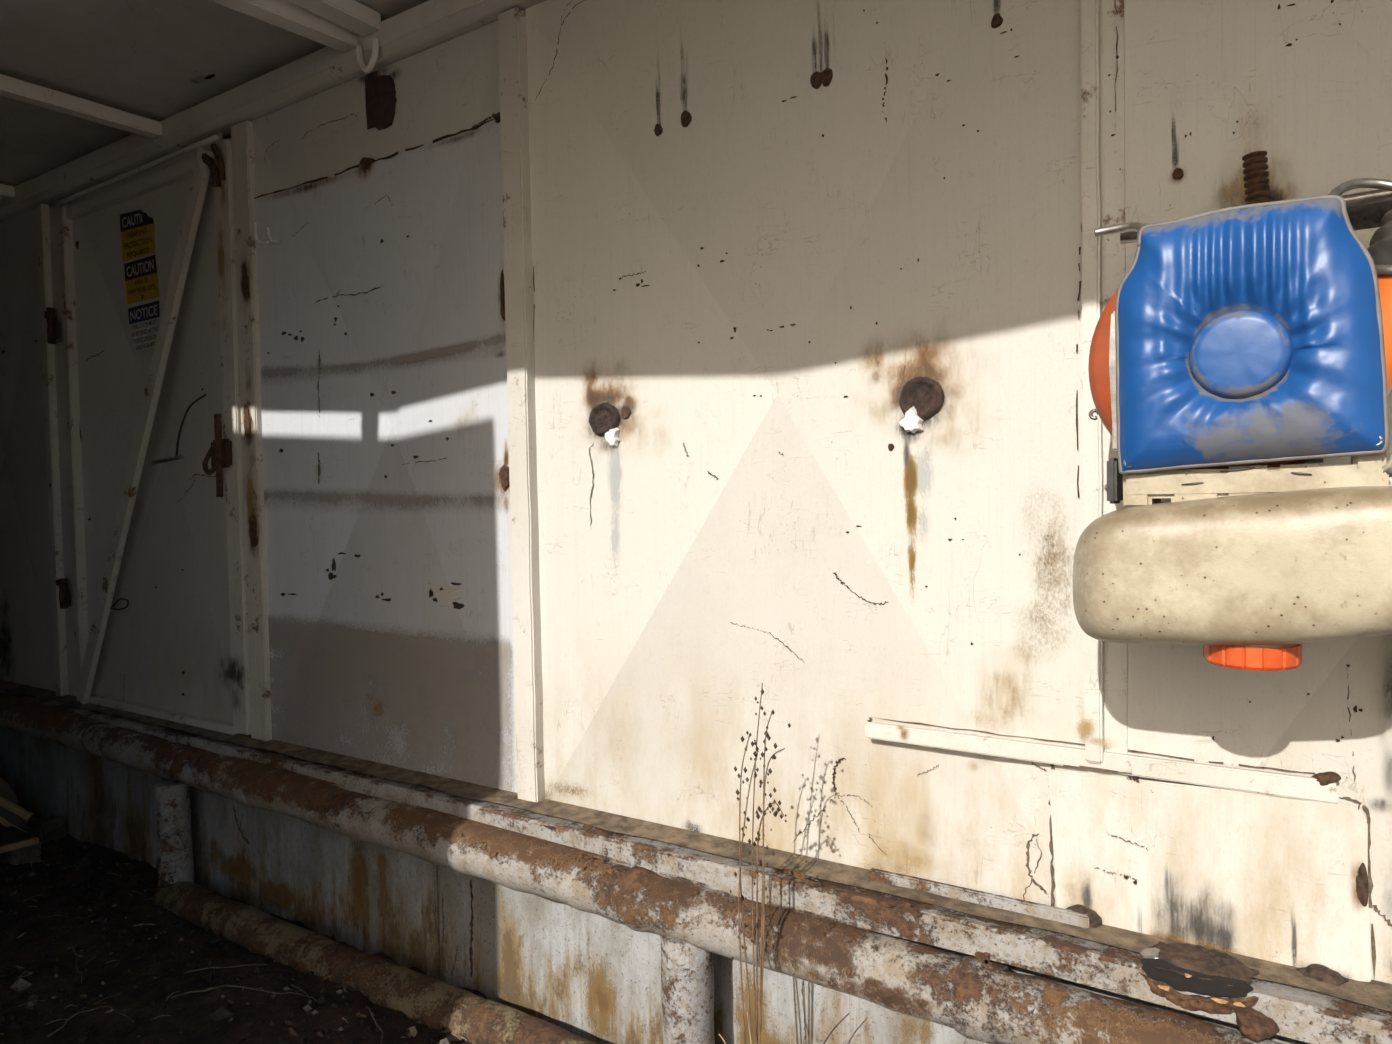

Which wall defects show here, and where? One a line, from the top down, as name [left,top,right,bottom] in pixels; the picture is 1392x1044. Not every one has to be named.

crack [535,0,585,101]
crack [254,112,500,236]
rust [586,371,634,548]
rust [888,346,944,586]
rust [381,800,627,877]
crack [792,758,887,855]
crack [867,717,1315,906]
rust [1311,771,1341,786]
rust [1354,862,1369,907]
crack [1339,677,1392,979]
peeling [1210,997,1246,1008]
rust [1295,964,1349,986]